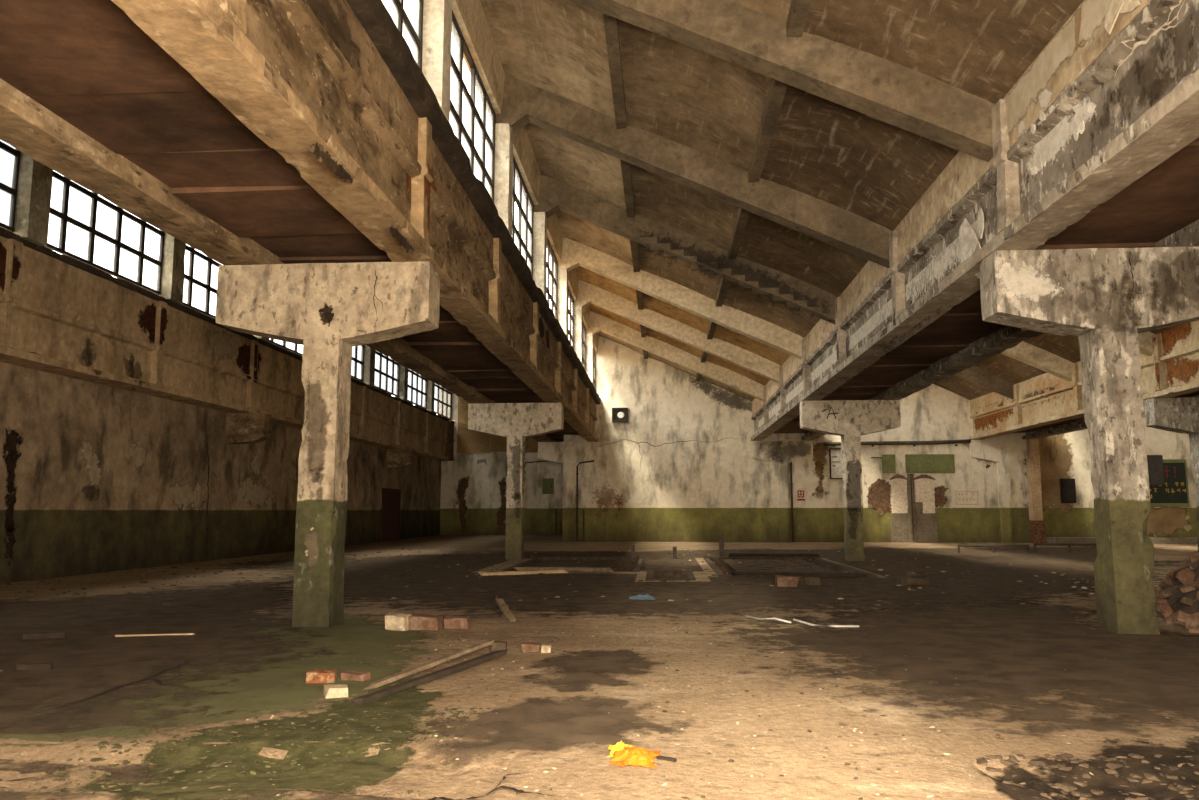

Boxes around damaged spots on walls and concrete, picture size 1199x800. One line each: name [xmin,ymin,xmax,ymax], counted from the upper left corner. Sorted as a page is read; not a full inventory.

leakage [2,429,23,565]
spalling [867,478,891,515]